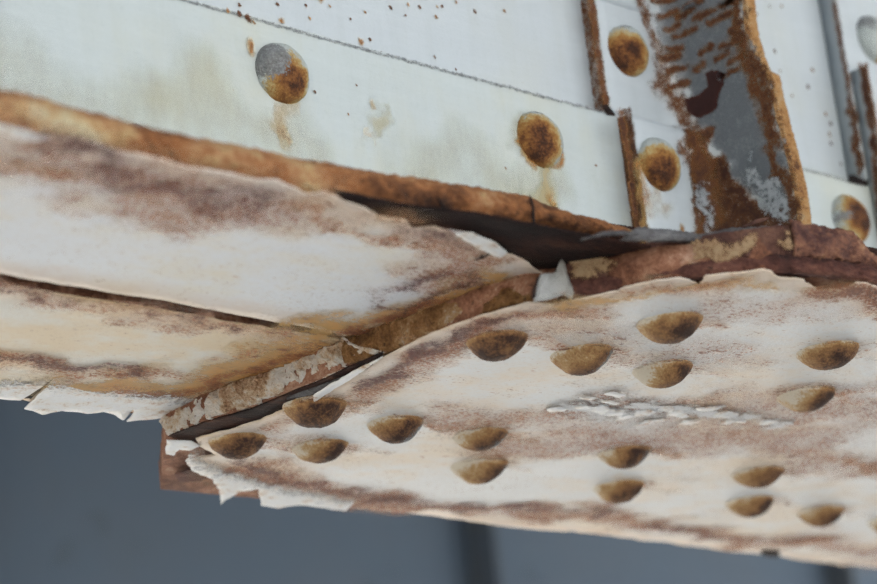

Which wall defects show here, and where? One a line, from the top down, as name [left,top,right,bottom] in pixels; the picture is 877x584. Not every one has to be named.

peeling [0,124,50,142]
rust [580,0,649,243]
rust [636,0,812,264]
rust [832,0,877,209]
rust [0,88,877,415]
spalling [331,189,651,302]
crack [531,276,540,300]
peeling [0,377,194,422]
peeling [163,432,357,511]
peeling [313,356,383,402]
rust [423,384,877,480]
peeling [542,392,793,431]